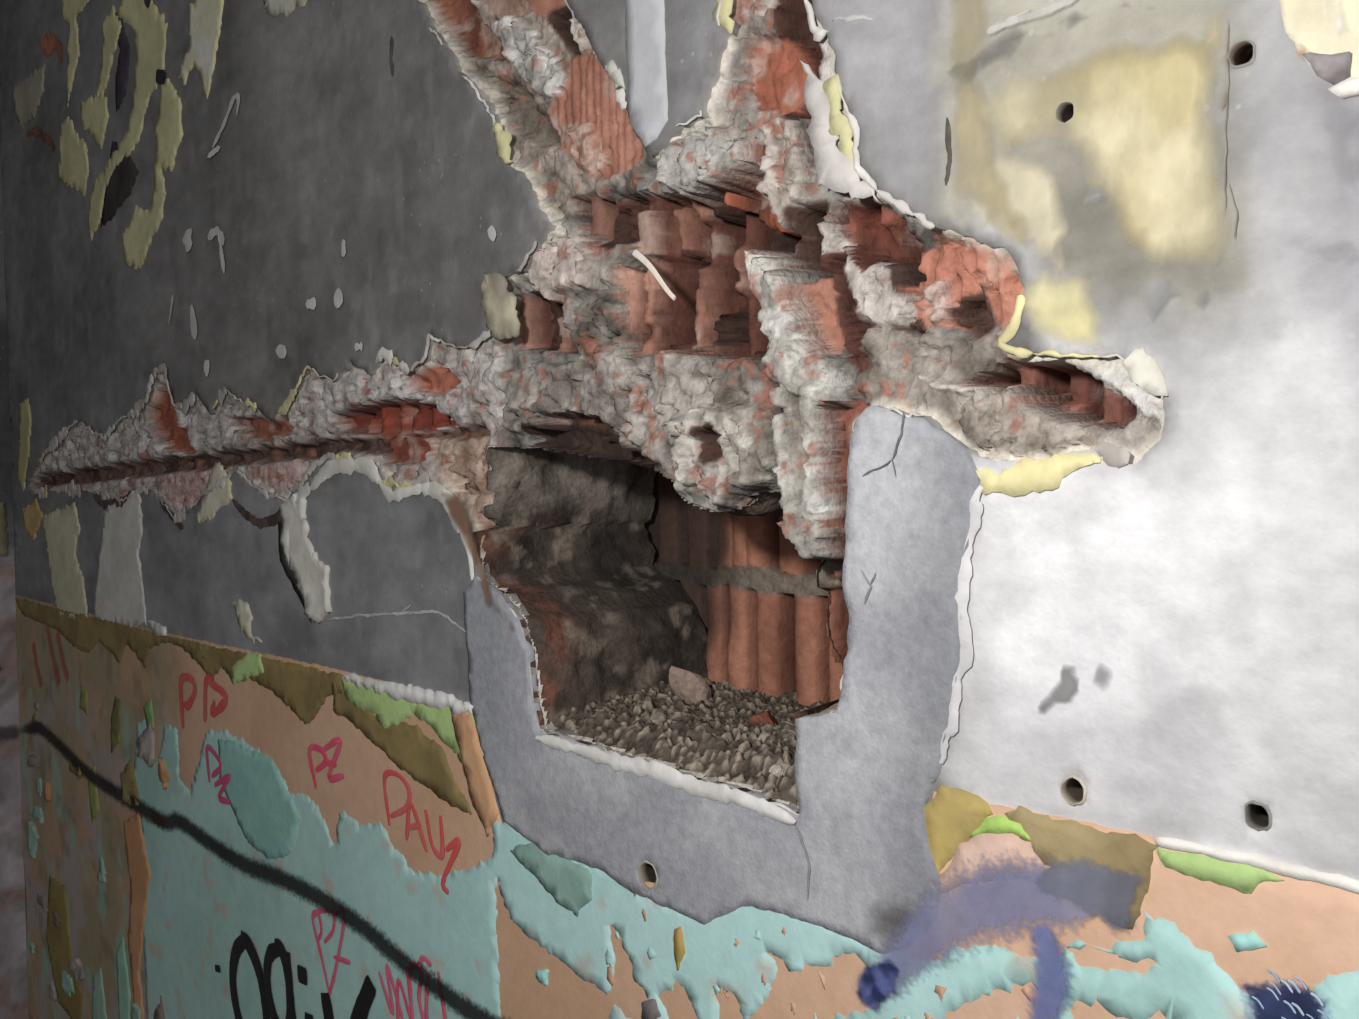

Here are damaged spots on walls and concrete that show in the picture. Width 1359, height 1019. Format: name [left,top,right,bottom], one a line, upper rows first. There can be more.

peeling [12,64,45,129]
damp [956,27,1218,256]
flaking render [1279,0,1359,99]
spalling [29,0,1169,825]
damp [1025,279,1092,339]
peeling [15,494,1359,1019]